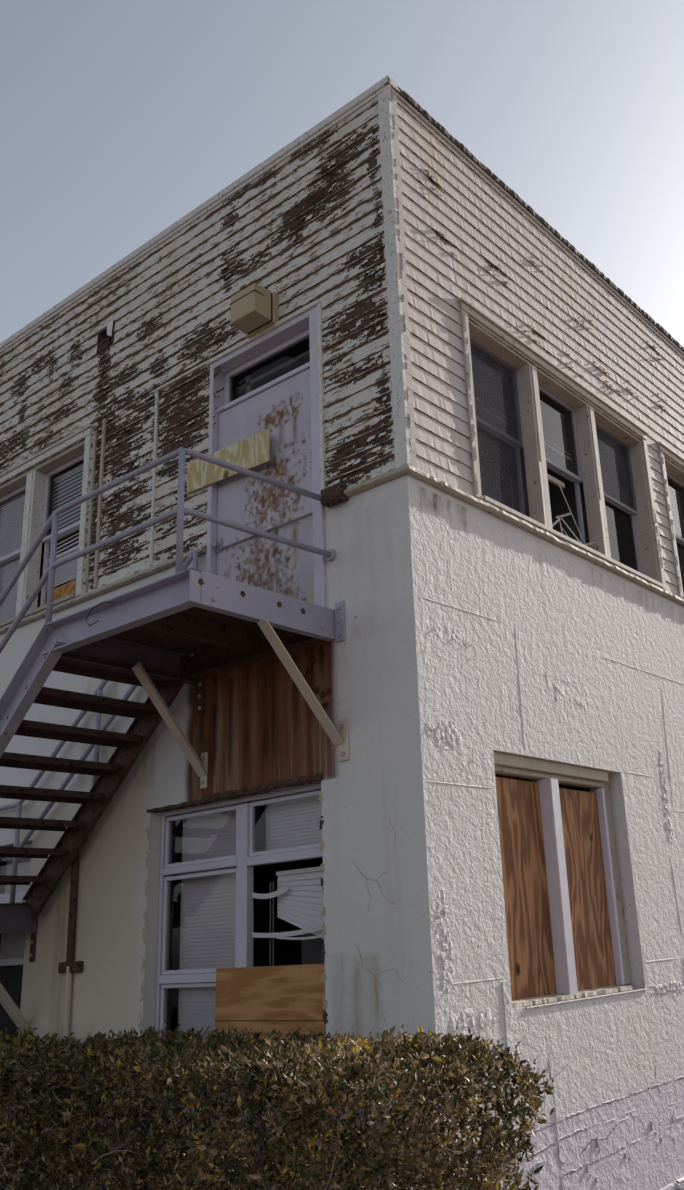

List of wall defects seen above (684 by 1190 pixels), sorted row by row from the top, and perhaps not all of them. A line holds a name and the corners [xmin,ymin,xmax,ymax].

peeling [432,228,457,257]
peeling [215,123,393,487]
peeling [0,316,240,590]
rust [246,440,305,534]
rust [258,398,298,431]
rust [236,548,290,594]
crack [517,1056,684,1190]